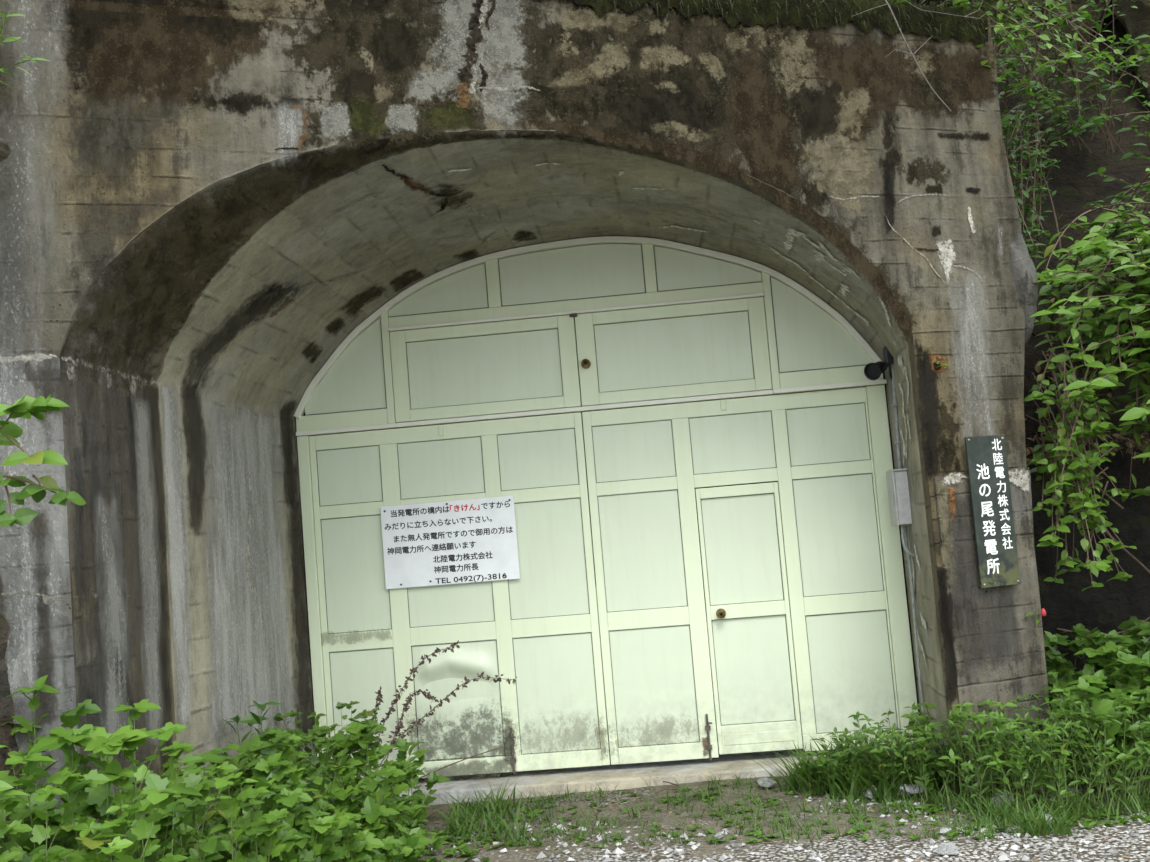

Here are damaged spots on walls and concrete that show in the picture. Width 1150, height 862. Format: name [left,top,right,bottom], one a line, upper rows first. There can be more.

crack [456,0,540,108]
crack [327,165,506,226]
damp [0,0,997,763]
damp [1009,469,1030,491]